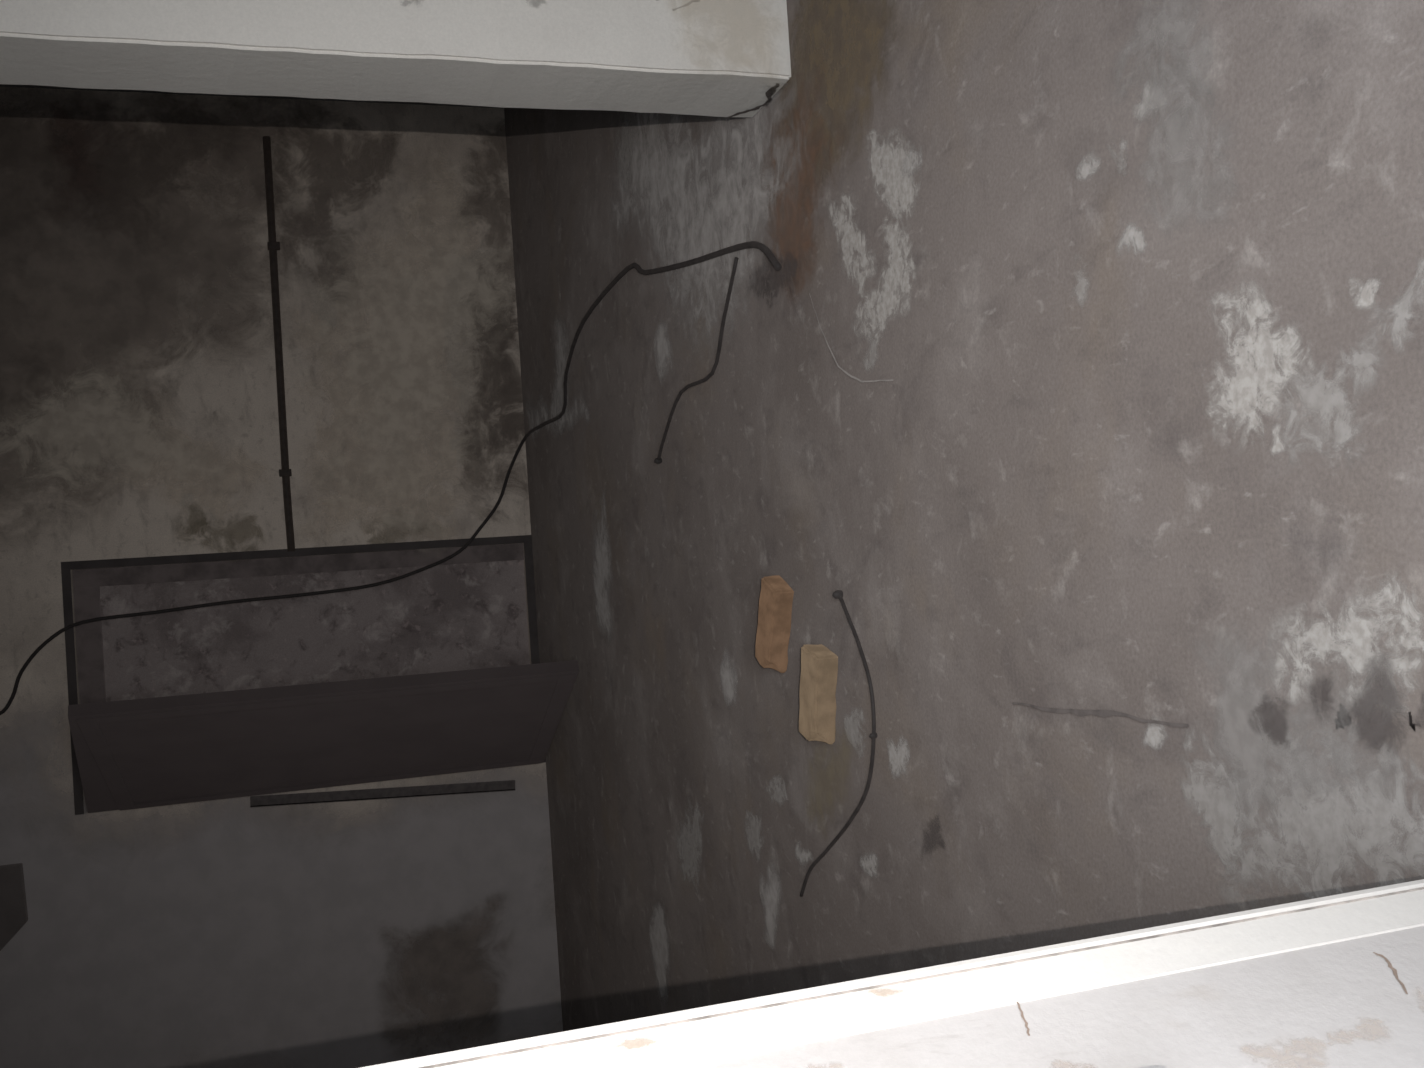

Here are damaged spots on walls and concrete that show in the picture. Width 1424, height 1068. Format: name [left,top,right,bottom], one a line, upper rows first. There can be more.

leakage [0,100,589,538]
leakage [1260,702,1286,743]
leakage [1353,667,1399,747]